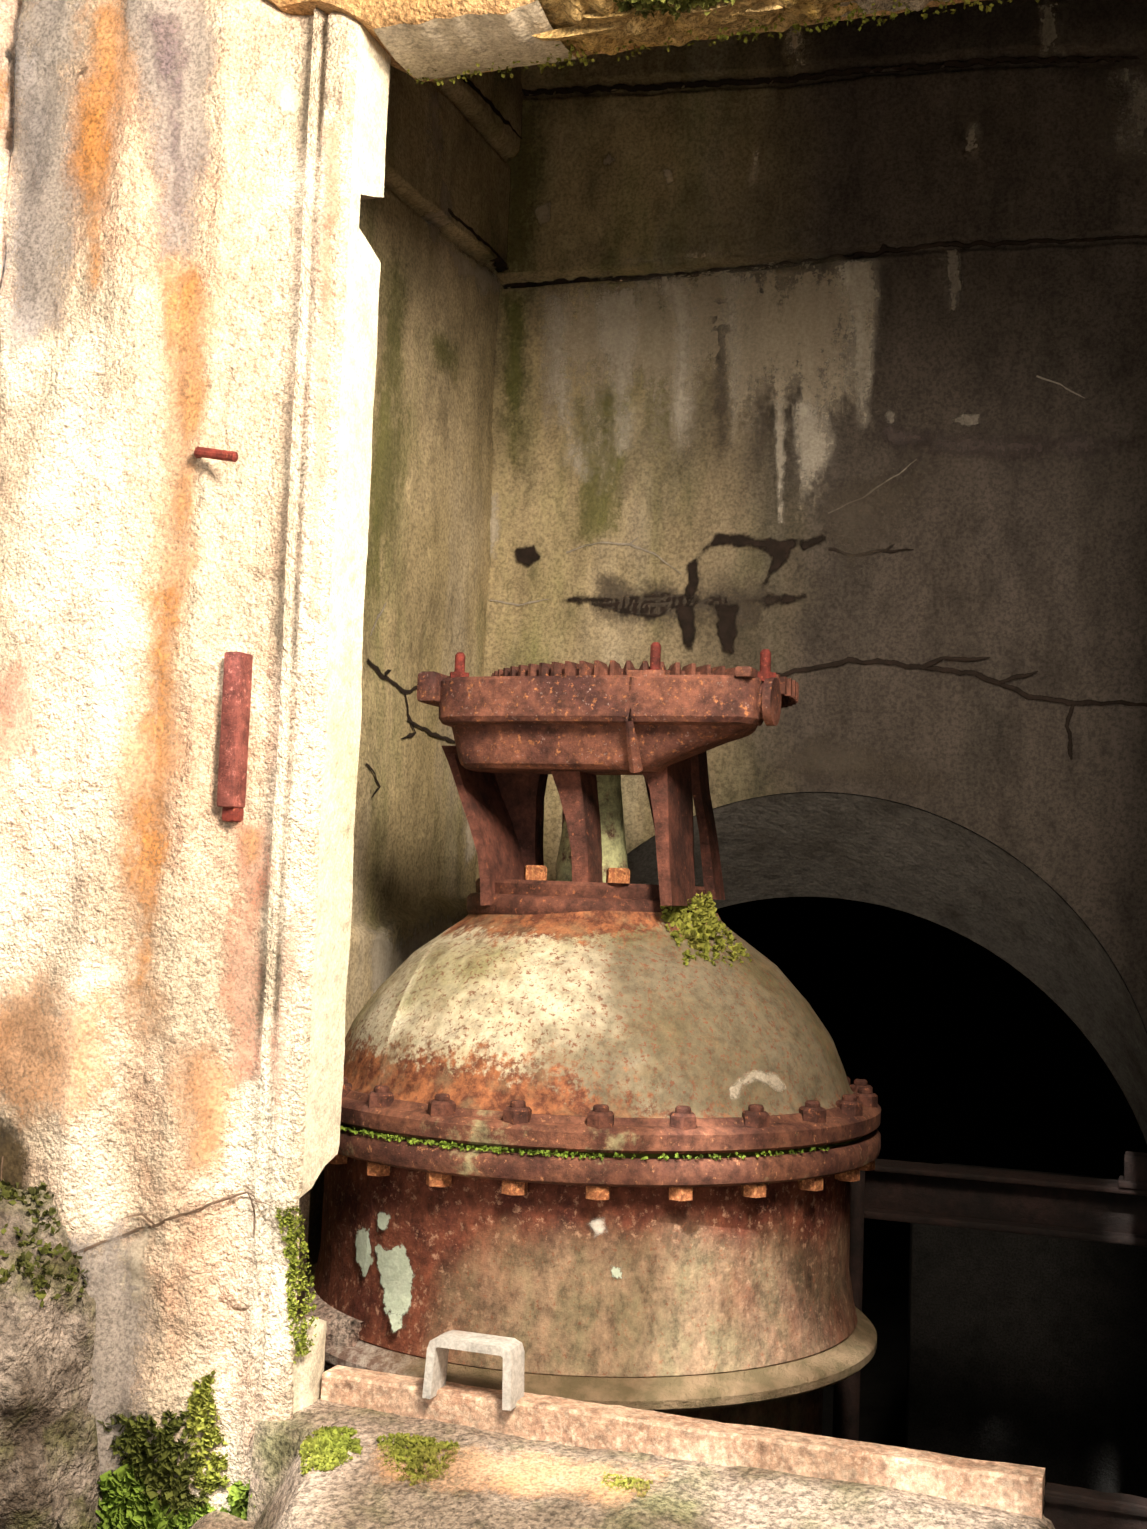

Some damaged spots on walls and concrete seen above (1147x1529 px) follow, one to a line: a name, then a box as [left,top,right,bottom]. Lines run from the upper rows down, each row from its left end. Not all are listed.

damp [3,0,88,347]
corrosion [68,0,140,285]
damp [125,0,217,255]
corrosion [311,127,340,612]
damp [542,253,874,475]
crack [366,763,381,798]
crack [367,602,455,743]
crack [490,533,914,654]
crack [776,656,1147,760]
crack [72,1192,271,1255]